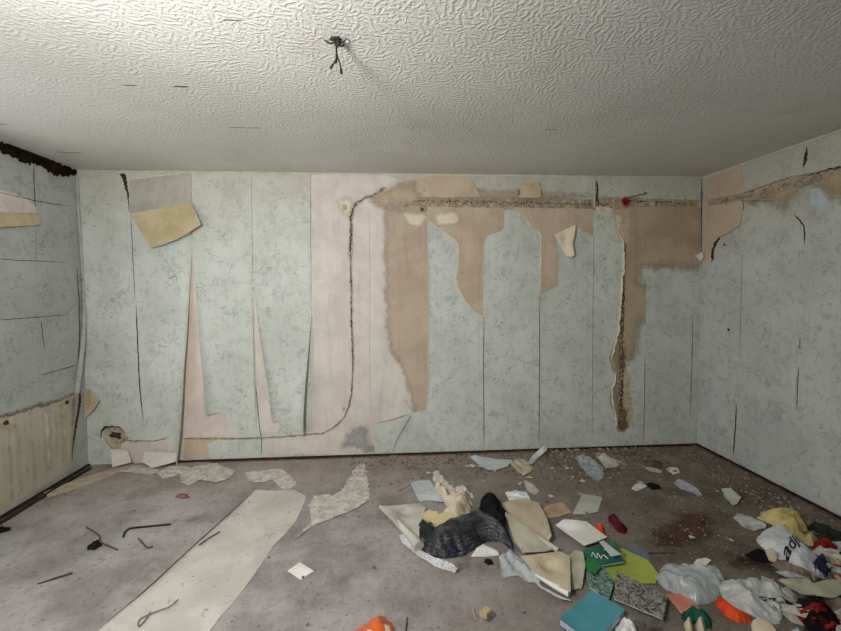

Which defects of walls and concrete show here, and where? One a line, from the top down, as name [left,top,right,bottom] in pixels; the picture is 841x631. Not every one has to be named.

flaking render [0,190,36,213]
flaking render [129,172,191,215]
flaking render [100,253,229,464]
flaking render [253,166,766,455]